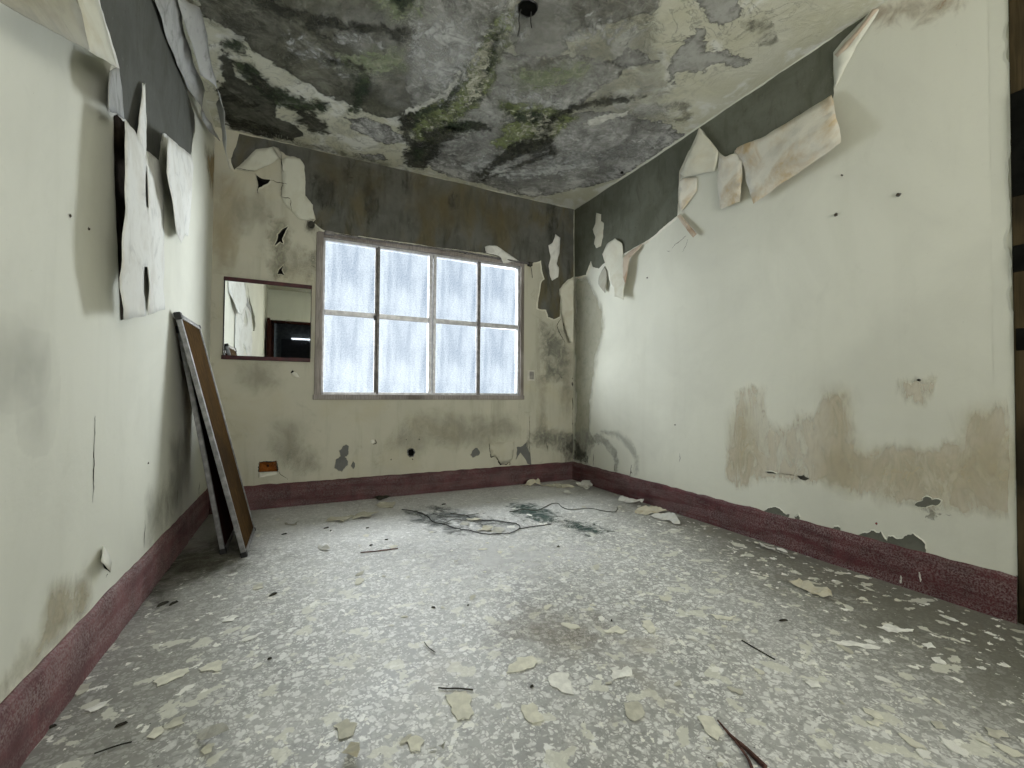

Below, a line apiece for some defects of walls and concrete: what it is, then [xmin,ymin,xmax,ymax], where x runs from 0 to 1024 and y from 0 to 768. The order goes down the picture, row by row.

leakage [221,39,332,136]
leakage [251,0,651,183]
peeling [155,0,751,197]
leakage [535,279,602,462]
spalling [334,444,356,472]
spalling [515,437,531,465]
spalling [765,506,801,519]
spalling [913,495,950,517]
spalling [860,522,928,552]